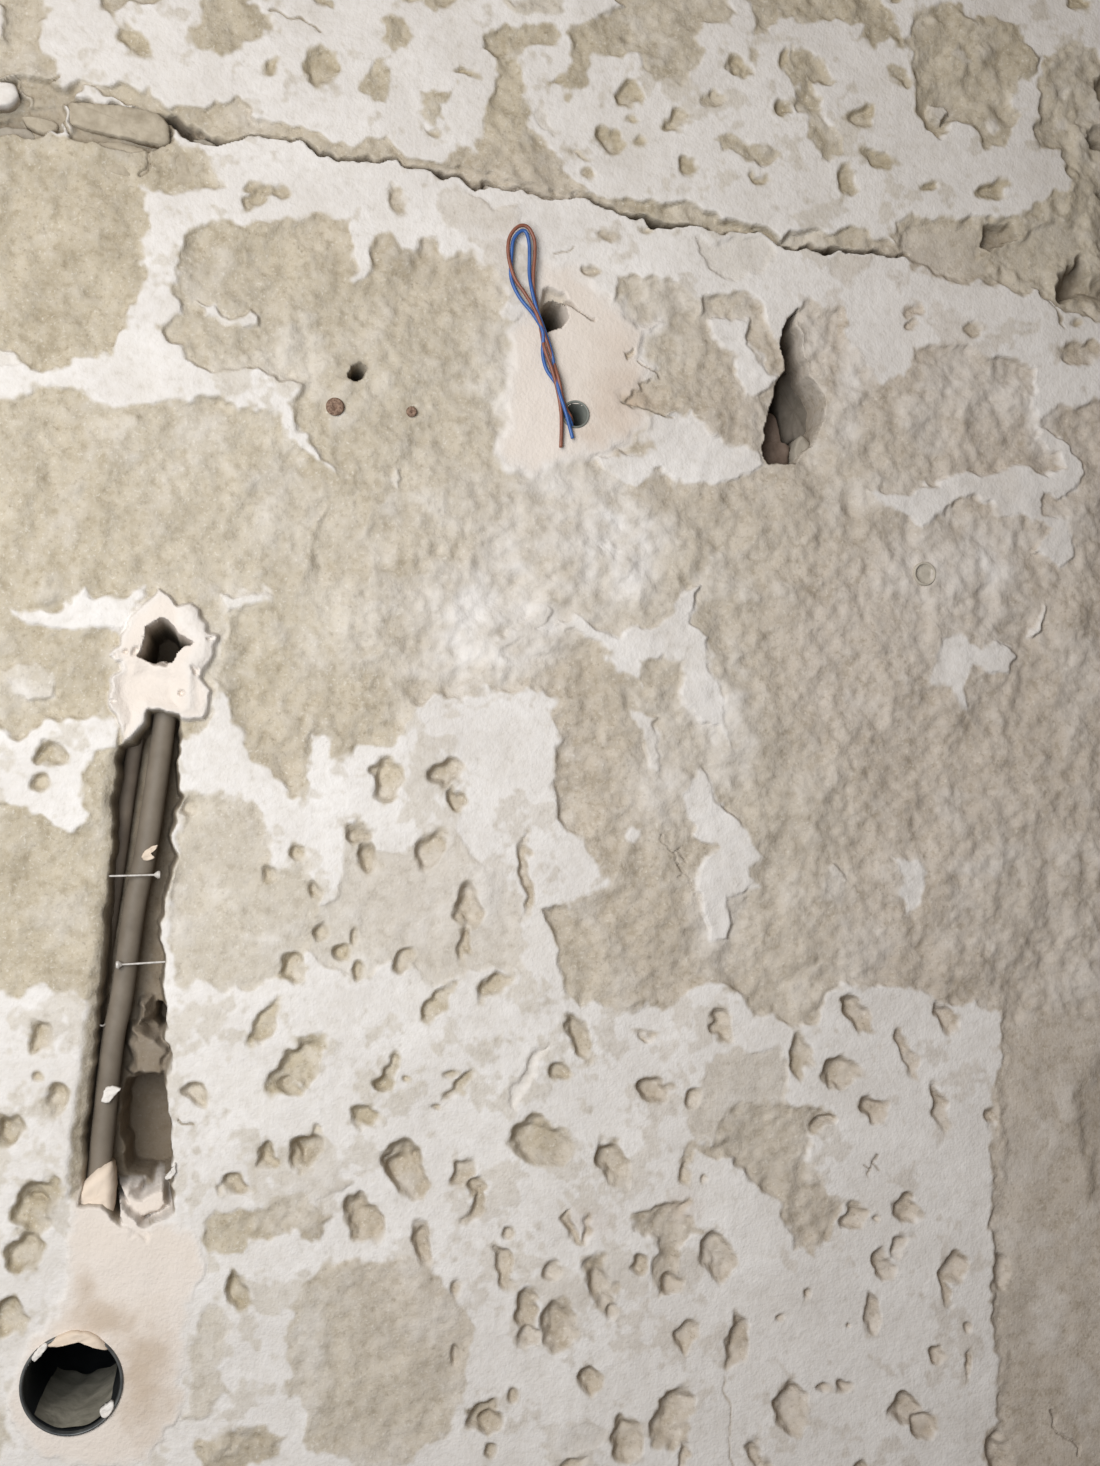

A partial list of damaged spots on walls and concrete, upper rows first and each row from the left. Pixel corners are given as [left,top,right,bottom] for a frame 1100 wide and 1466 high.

spalling [0,0,60,114]
spalling [0,116,230,374]
crack [0,76,909,258]
spalling [422,0,1100,368]
crack [1038,291,1066,329]
spalling [0,213,1100,1037]
spalling [3,1174,67,1277]
spalling [176,1123,520,1466]
spalling [506,1042,582,1170]
spalling [492,1205,740,1357]
spalling [679,1032,881,1257]
spalling [983,1004,1100,1466]